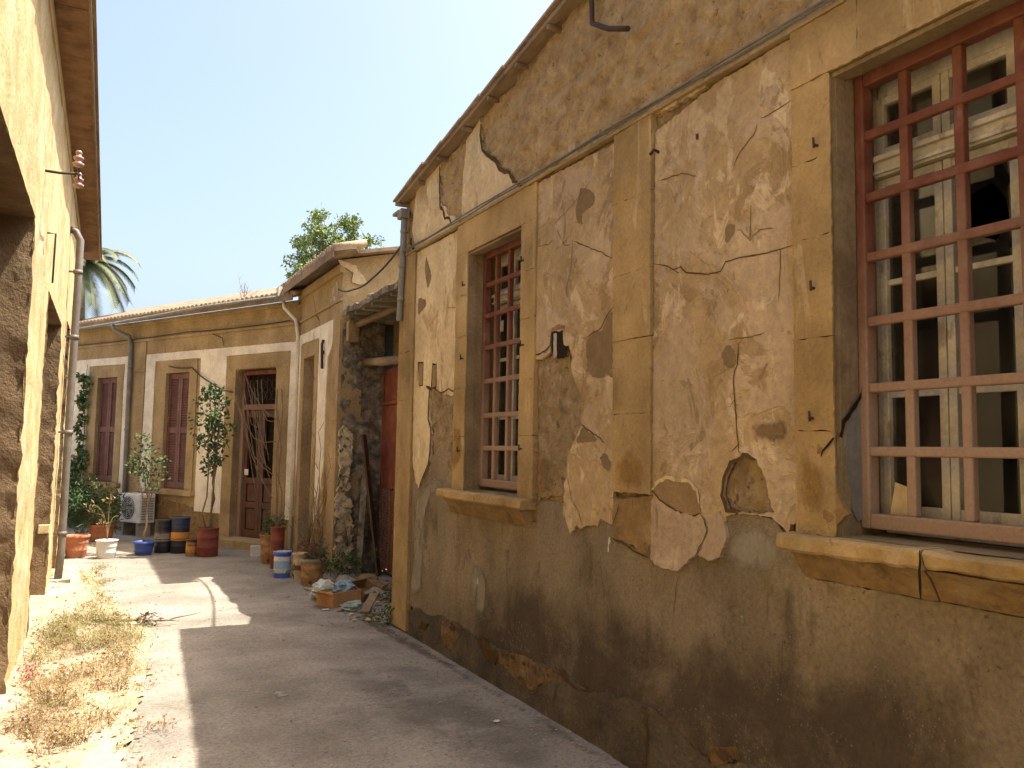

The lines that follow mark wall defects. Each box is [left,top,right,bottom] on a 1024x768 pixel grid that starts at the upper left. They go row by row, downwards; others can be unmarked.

crack [542,181,611,292]
peeling [576,188,595,224]
crack [656,208,793,299]
peeling [586,312,613,378]
spalling [431,388,454,470]
peeling [600,453,611,471]
crack [729,333,763,455]
peeling [612,453,774,572]
crack [916,550,924,599]
leakage [476,547,1016,768]